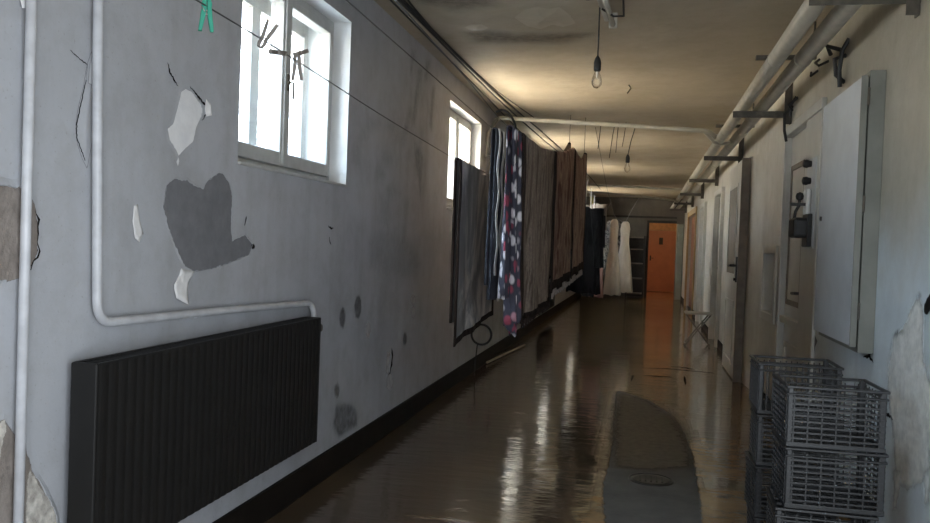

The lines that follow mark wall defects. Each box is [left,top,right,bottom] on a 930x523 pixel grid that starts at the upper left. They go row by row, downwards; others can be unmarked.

peeling [165,64,212,166]
spalling [0,176,21,289]
spalling [30,189,43,277]
peeling [161,171,255,305]
peeling [888,294,930,506]
spalling [0,413,15,523]
spalling [24,441,60,523]